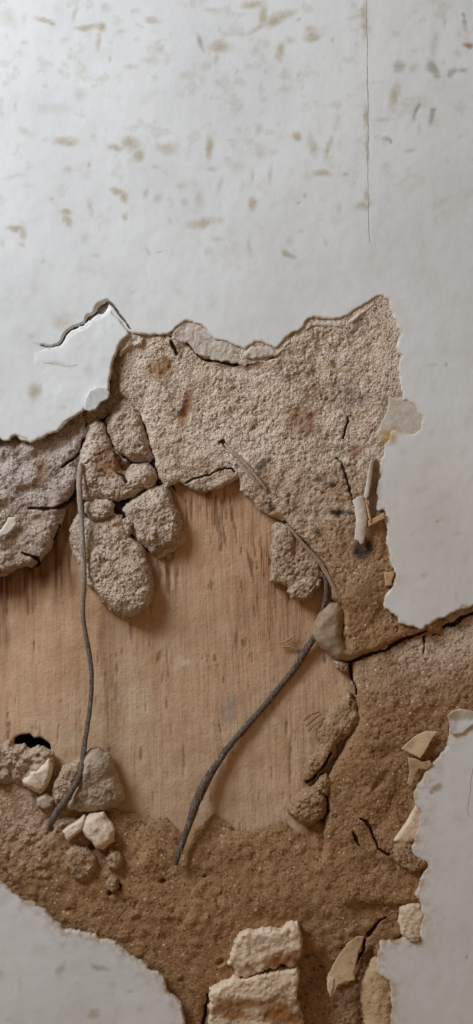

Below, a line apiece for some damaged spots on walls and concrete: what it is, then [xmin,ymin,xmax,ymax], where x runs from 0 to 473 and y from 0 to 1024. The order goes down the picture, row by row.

crack [364,0,372,243]
crack [44,301,130,366]
crack [170,336,276,366]
crack [22,417,235,570]
crack [340,417,353,500]
flaking render [0,296,473,1024]
crack [346,612,473,695]
crack [352,818,389,856]